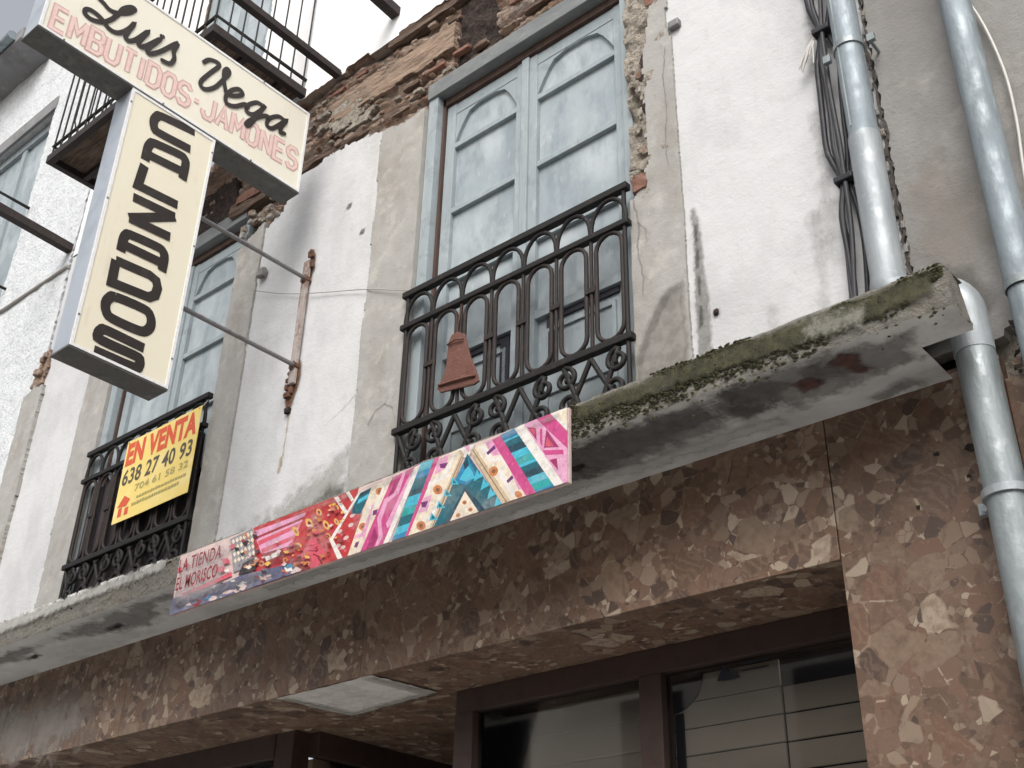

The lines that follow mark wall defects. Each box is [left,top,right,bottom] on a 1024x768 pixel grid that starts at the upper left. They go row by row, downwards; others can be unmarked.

peeling [301,0,563,175]
spalling [622,0,664,197]
corrosion [308,249,316,277]
spalling [30,349,53,390]
corrosion [283,360,301,443]
corrosion [790,379,824,393]
corrosion [829,354,874,373]
water stain [58,595,174,639]
water stain [0,648,32,664]